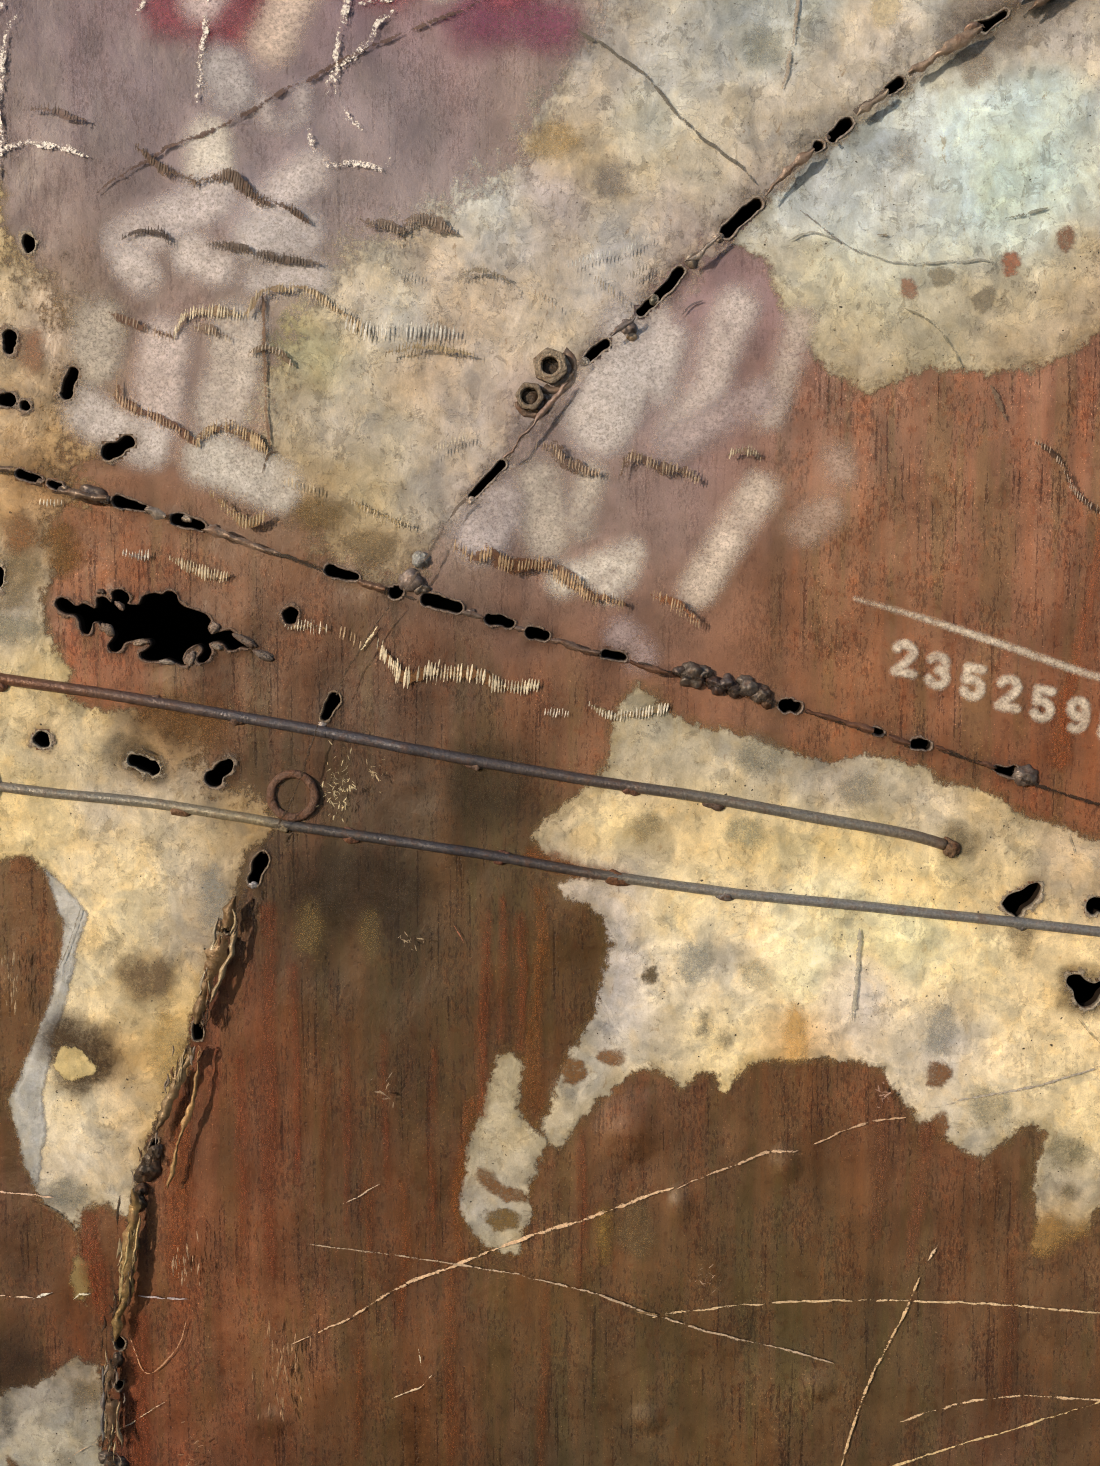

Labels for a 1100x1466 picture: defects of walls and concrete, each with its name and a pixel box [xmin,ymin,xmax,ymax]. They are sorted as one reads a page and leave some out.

crack [576,29,756,184]
crack [789,210,989,265]
peeling [720,0,1100,395]
crack [1005,207,1048,219]
crack [905,308,962,367]
peeling [0,169,278,1231]
rust [641,966,658,983]
peeling [458,681,1100,1256]
rust [561,1050,624,1085]
rust [926,1062,952,1086]
rust [476,1169,527,1232]
peeling [0,1356,106,1466]